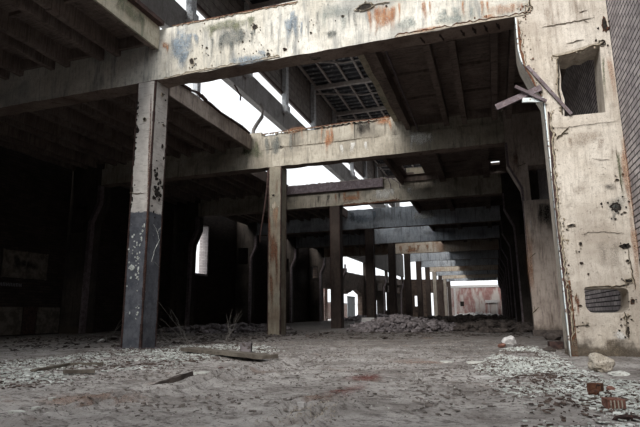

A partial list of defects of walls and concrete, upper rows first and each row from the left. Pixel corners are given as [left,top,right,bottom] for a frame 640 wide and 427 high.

rust [367,4,400,27]
water stain [173,32,198,62]
water stain [210,17,255,50]
peeling [151,157,164,218]
spalling [600,196,630,220]
peeling [128,223,145,280]
rust [566,280,579,357]